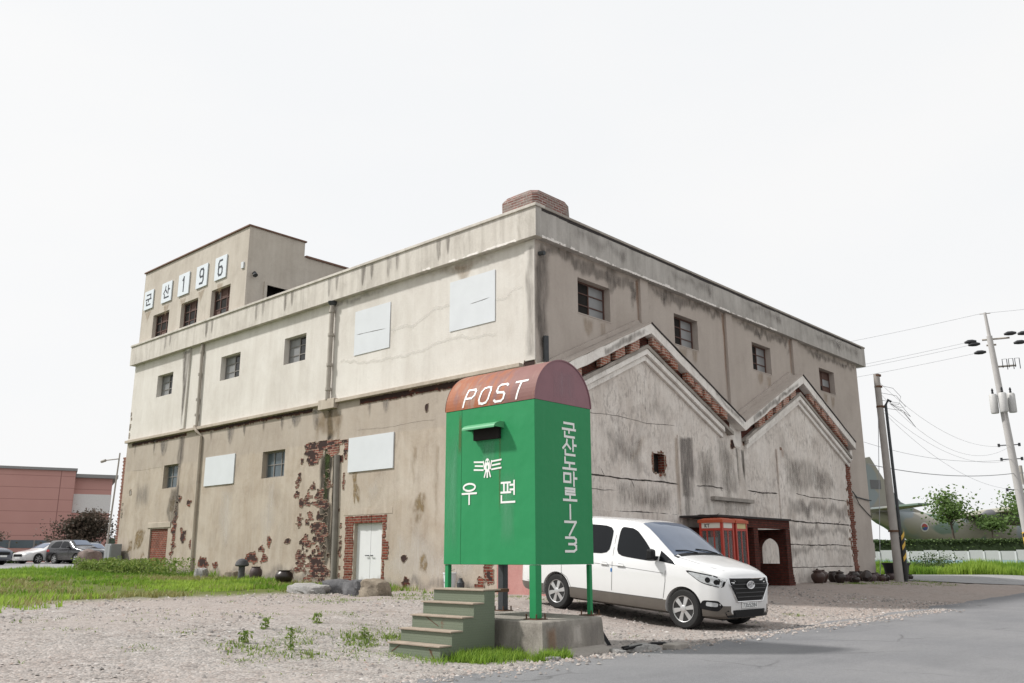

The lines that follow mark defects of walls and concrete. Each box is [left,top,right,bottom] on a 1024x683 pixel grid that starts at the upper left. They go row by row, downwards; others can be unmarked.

flaking render [169,495,218,569]
flaking render [245,439,359,583]